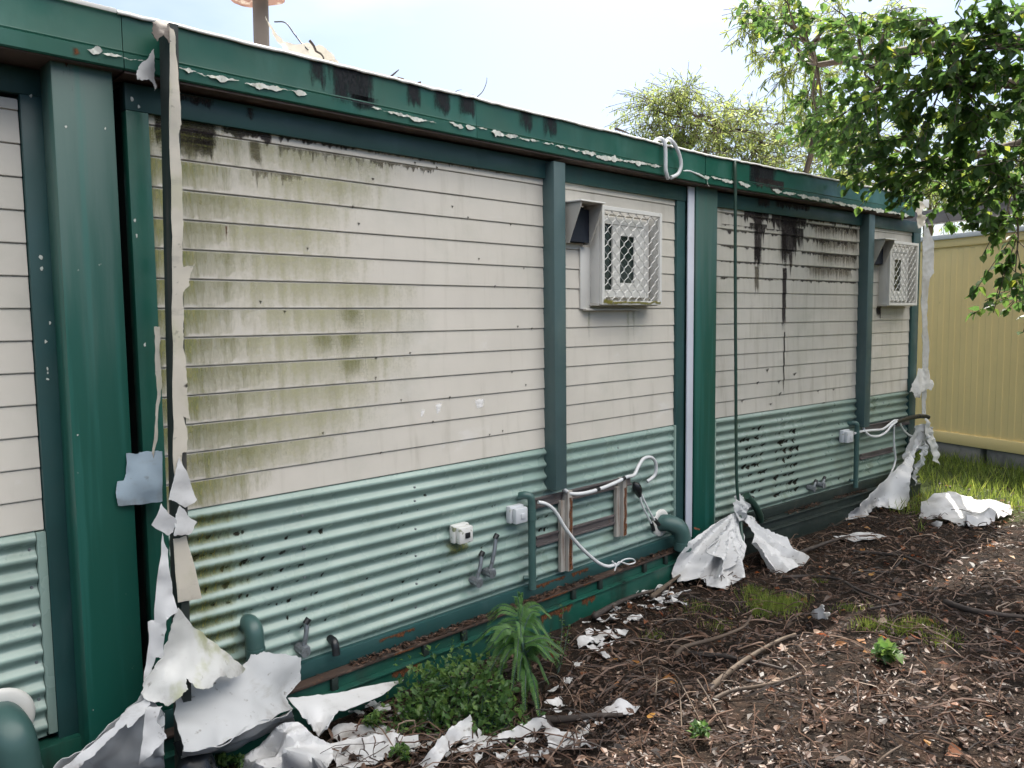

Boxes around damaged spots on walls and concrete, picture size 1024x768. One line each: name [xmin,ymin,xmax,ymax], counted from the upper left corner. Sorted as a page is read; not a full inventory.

peeling [87,46,143,61]
water stain [180,93,211,108]
peeling [179,67,307,96]
water stain [310,61,375,110]
peeling [371,106,435,123]
water stain [407,84,421,106]
water stain [435,91,475,116]
water stain [520,111,557,134]
peeling [450,122,660,168]
water stain [149,116,165,297]
water stain [721,164,859,405]
water stain [180,108,508,503]